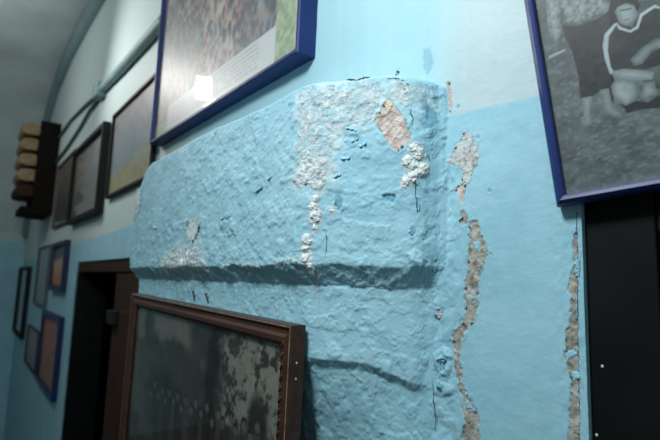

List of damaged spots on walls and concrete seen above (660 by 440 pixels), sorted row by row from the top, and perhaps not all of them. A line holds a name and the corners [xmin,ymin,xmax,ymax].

damp [274,79,426,334]
peeling [374,98,411,153]
damp [399,141,431,189]
peeling [446,130,480,203]
peeling [452,211,492,440]
peeling [564,230,581,440]